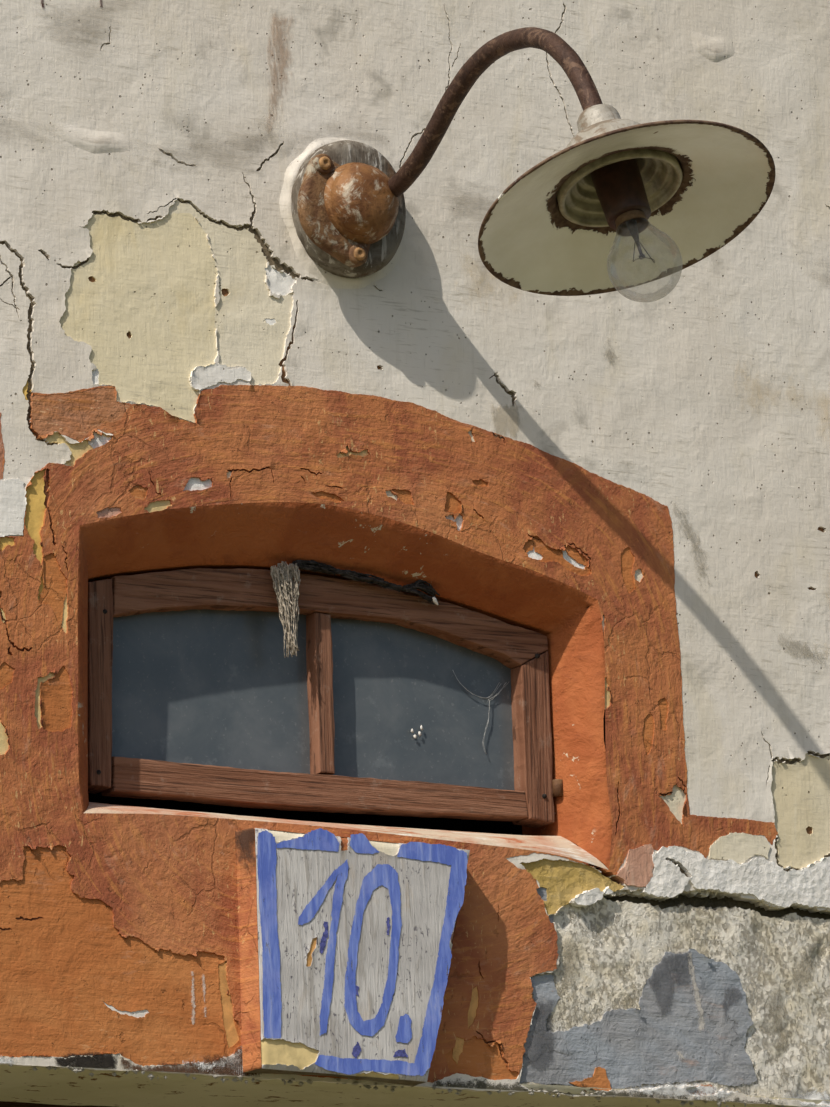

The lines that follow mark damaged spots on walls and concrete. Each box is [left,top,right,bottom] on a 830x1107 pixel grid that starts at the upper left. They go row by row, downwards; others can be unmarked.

crack [92,143,315,282]
peeling [22,199,296,467]
peeling [0,413,47,600]
crack [227,467,268,497]
peeling [0,722,10,755]
peeling [35,666,72,732]
flaking render [445,753,830,1107]
crack [603,860,830,920]